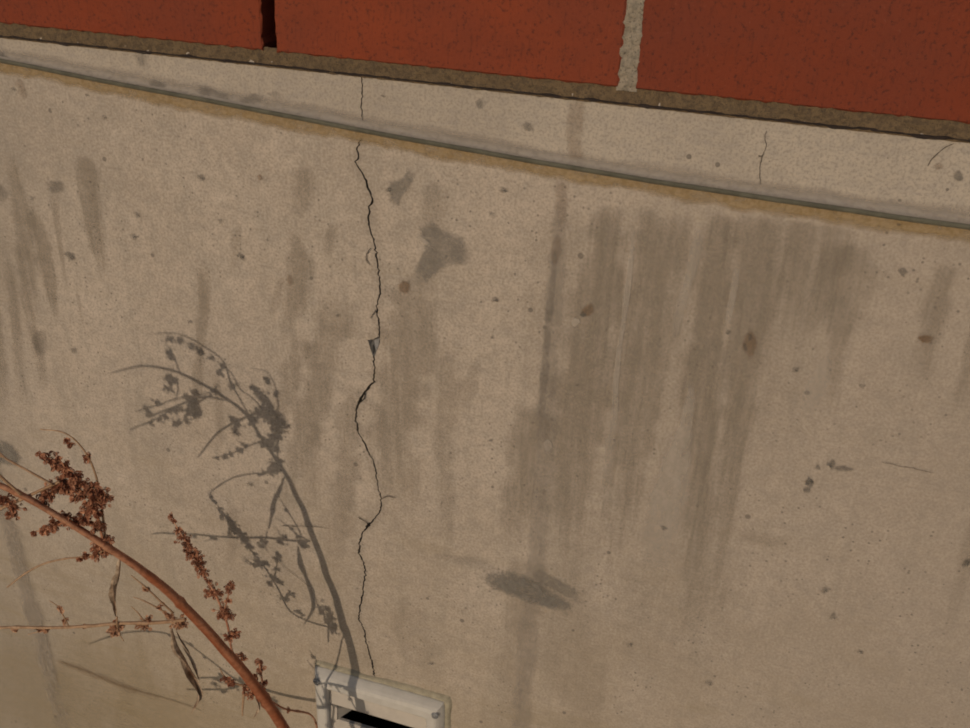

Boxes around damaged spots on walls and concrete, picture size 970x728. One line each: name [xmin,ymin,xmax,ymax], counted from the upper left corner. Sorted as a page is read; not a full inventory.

crack [354,77,394,676]